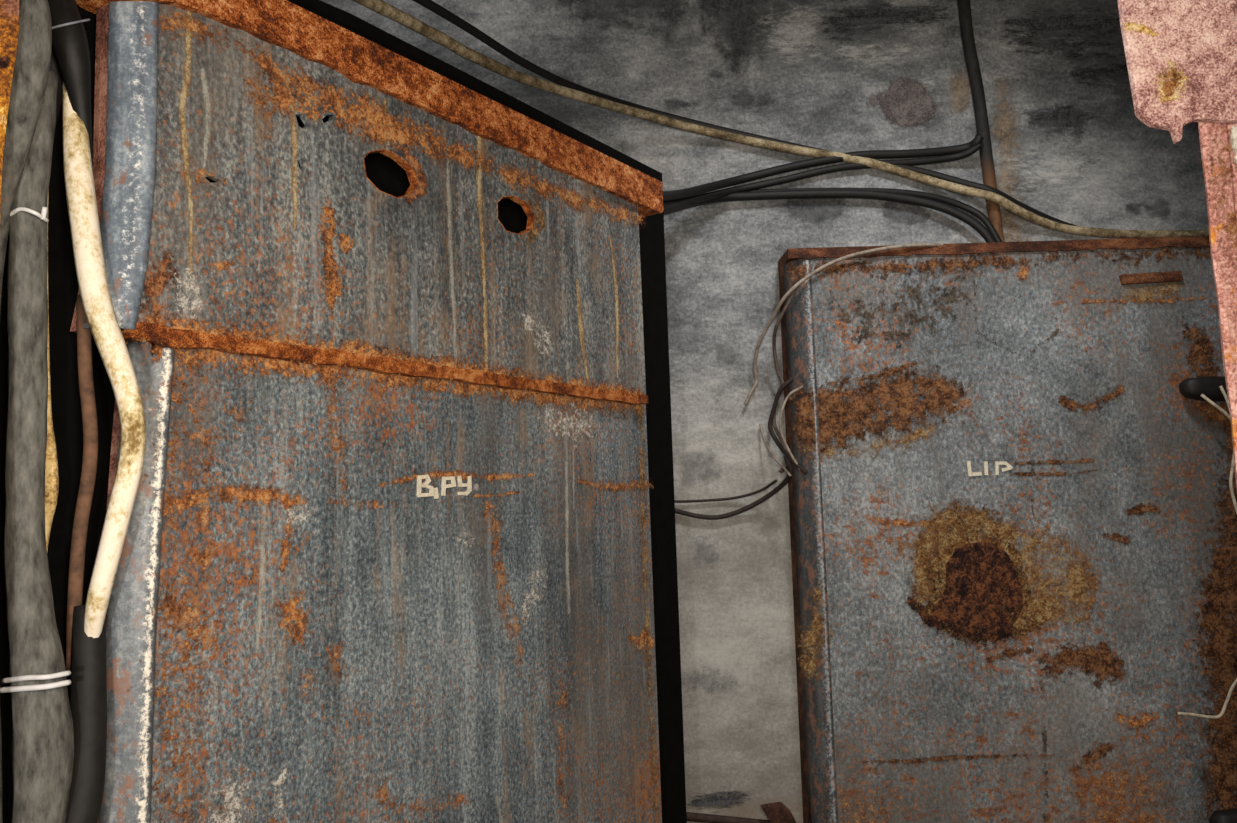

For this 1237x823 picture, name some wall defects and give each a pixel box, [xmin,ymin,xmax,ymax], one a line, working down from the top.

leakage [819,3,951,66]
leakage [1002,9,1128,86]
rust [159,5,645,230]
leakage [1027,105,1101,140]
rust [123,251,658,823]